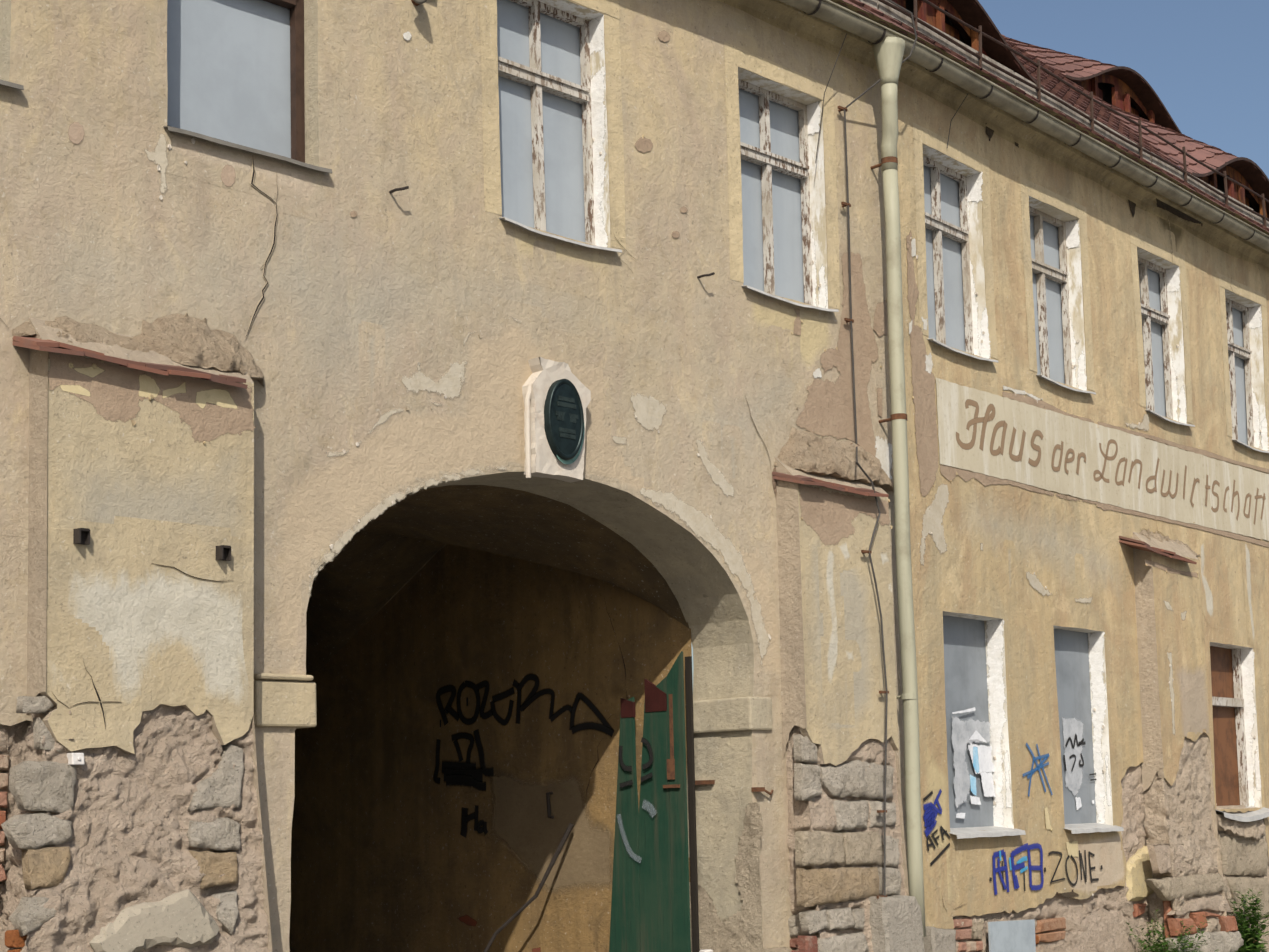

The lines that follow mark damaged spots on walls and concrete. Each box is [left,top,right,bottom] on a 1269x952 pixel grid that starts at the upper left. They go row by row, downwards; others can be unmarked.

flaking render [48,352,256,444]
crack [245,155,278,338]
flaking render [255,296,781,696]
peeling [791,219,827,335]
flaking render [796,252,893,480]
flaking render [799,484,893,545]
flaking render [906,231,1269,565]
crack [51,661,118,729]
spalling [0,692,269,952]
spalling [689,802,764,952]
spalling [786,725,907,952]
spalling [953,619,1269,952]